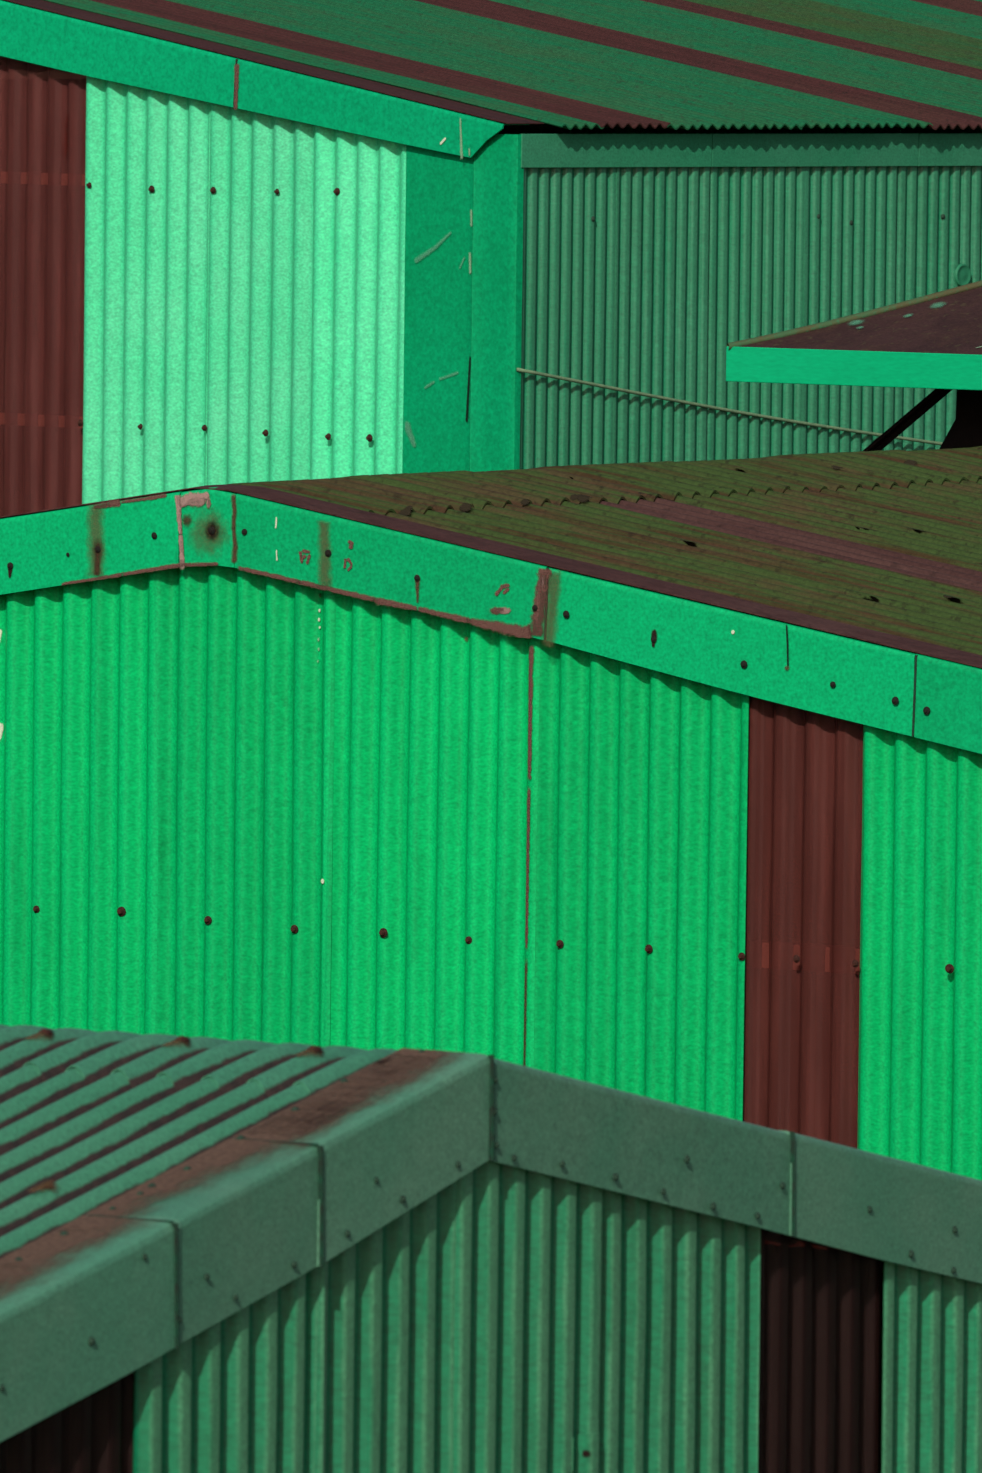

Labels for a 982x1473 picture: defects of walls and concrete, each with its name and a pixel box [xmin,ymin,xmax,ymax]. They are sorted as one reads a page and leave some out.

corrosion [62,494,558,1066]